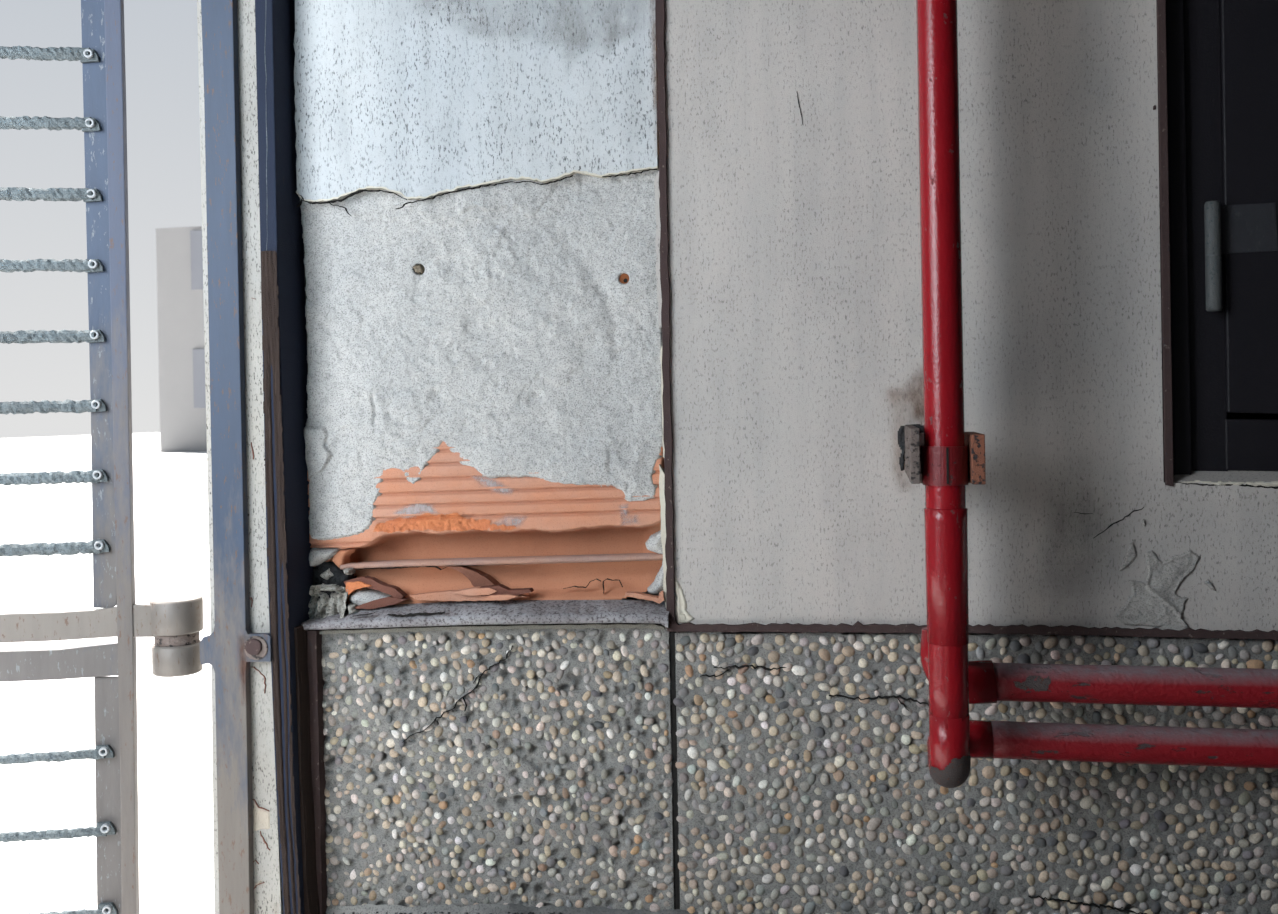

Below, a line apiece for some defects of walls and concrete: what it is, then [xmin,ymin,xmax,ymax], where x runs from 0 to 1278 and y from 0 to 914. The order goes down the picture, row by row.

crack [295,169,657,216]
spalling [296,166,695,623]
crack [402,646,513,743]
crack [700,665,786,677]
crack [829,694,929,711]